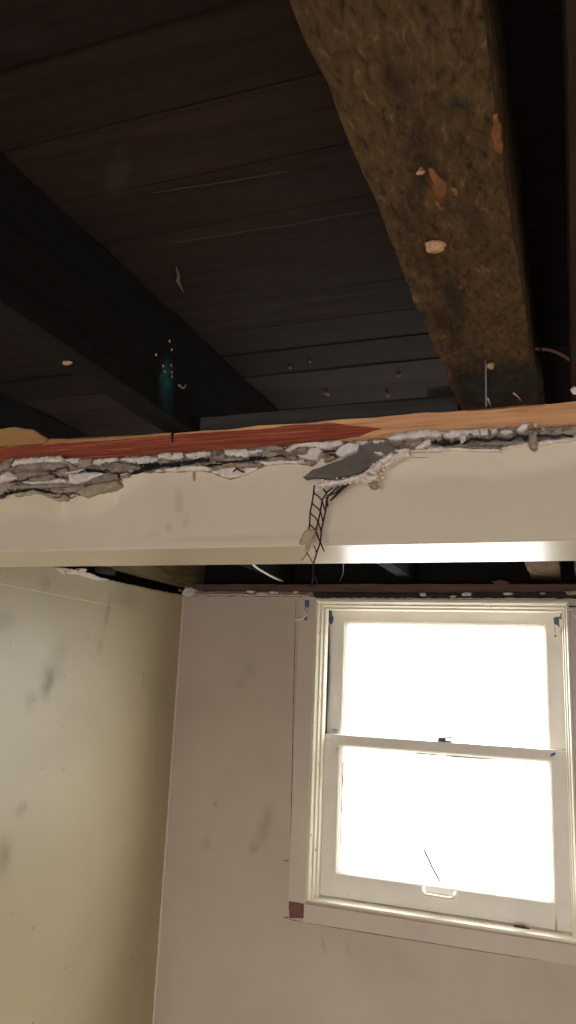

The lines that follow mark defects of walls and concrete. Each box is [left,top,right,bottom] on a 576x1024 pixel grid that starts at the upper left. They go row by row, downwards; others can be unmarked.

flaking render [0,423,576,502]